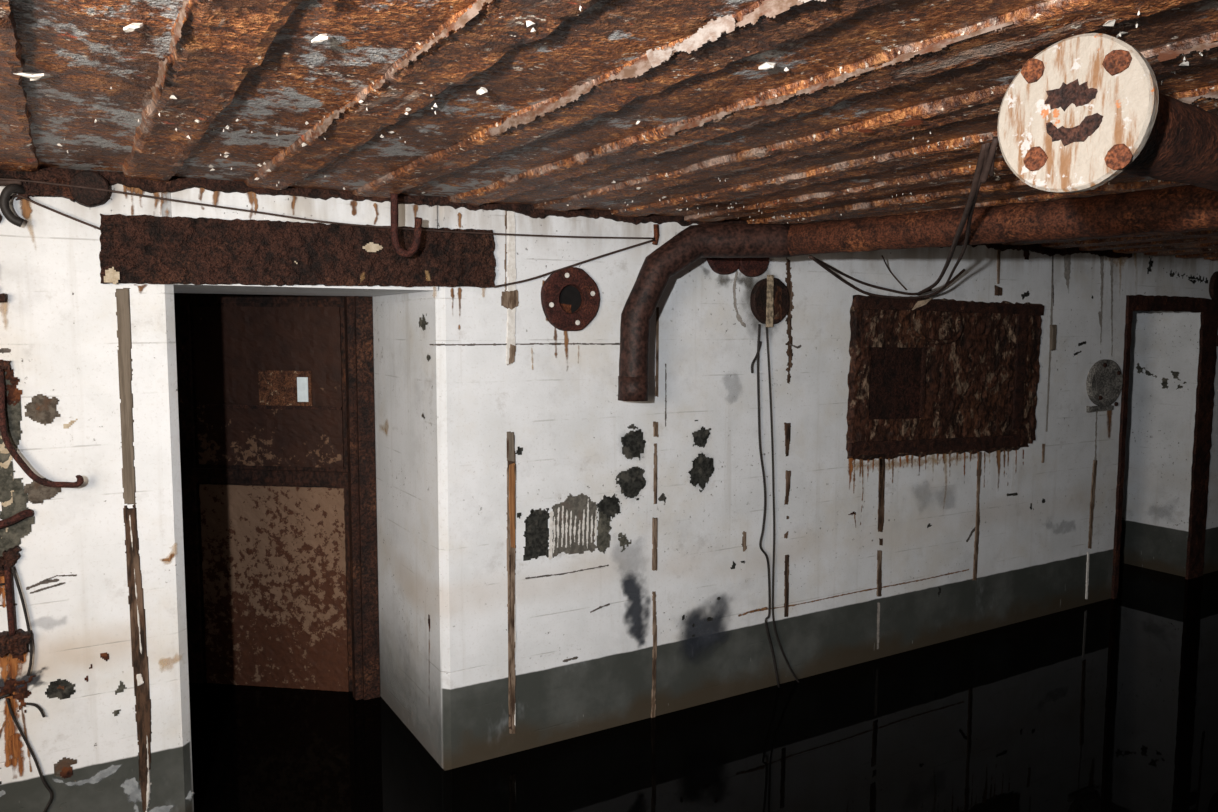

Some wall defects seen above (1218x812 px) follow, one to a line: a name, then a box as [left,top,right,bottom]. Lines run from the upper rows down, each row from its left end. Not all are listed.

corrosion [0,167,748,228]
corrosion [959,244,1132,260]
spalling [0,348,78,556]
peeling [688,420,714,492]
peeling [517,424,646,561]
peeling [26,574,77,594]
spalling [0,652,109,713]